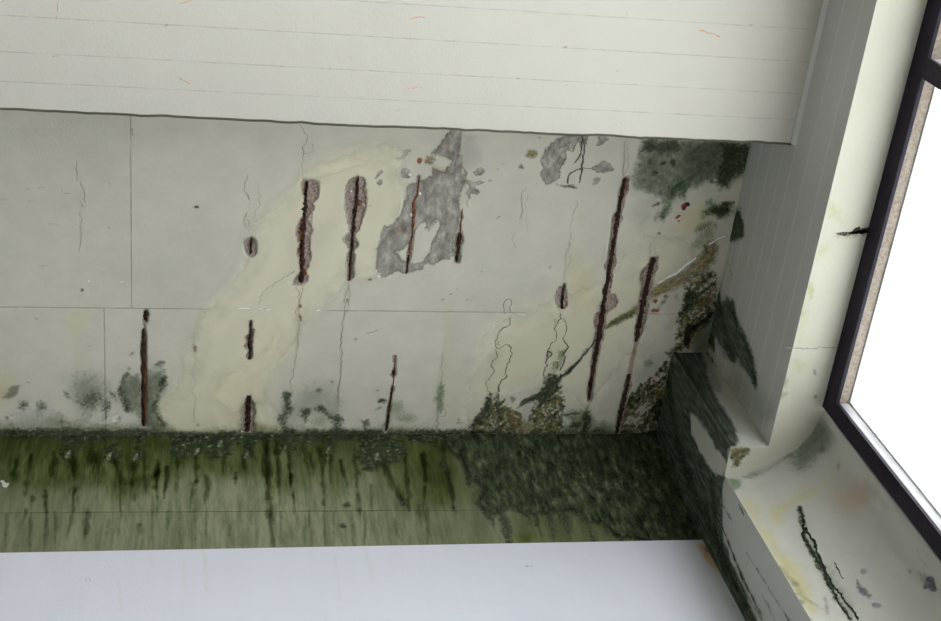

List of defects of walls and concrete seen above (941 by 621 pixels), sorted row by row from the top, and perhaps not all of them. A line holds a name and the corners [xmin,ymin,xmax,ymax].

peeling [376,130,484,277]
peeling [541,136,614,188]
crack [485,299,513,395]
crack [521,235,726,404]
damp [113,453,169,493]
damp [481,508,512,543]
crack [797,506,859,620]